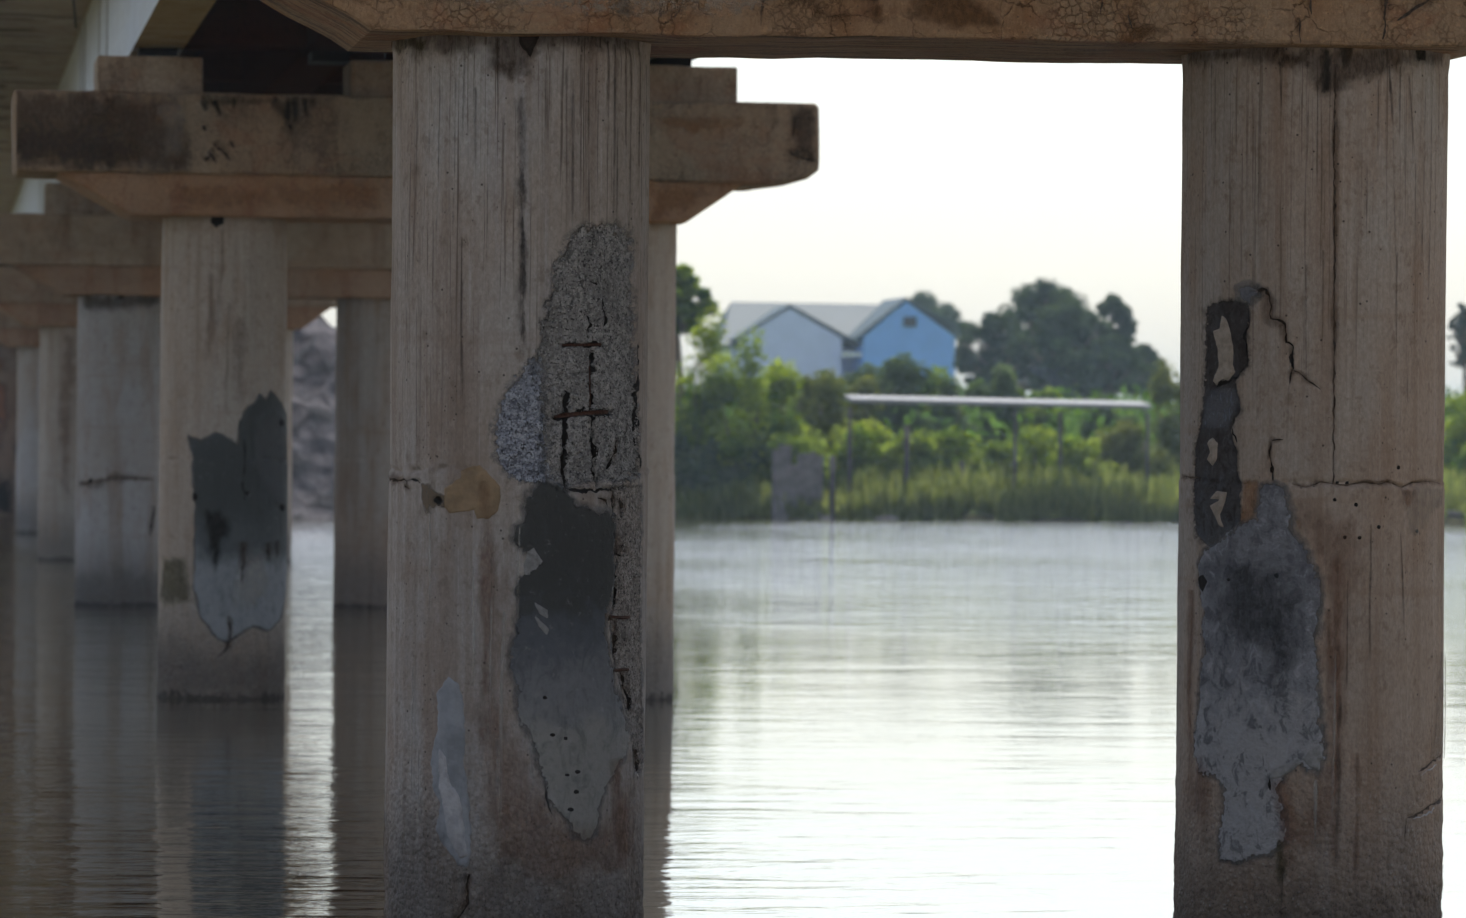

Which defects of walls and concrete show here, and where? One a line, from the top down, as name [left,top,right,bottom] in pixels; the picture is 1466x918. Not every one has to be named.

water stain [0,0,188,170]
crack [1297,0,1312,43]
crack [1382,0,1433,40]
spalling [421,222,644,778]
peeling [1193,299,1250,546]
crack [1234,64,1440,539]